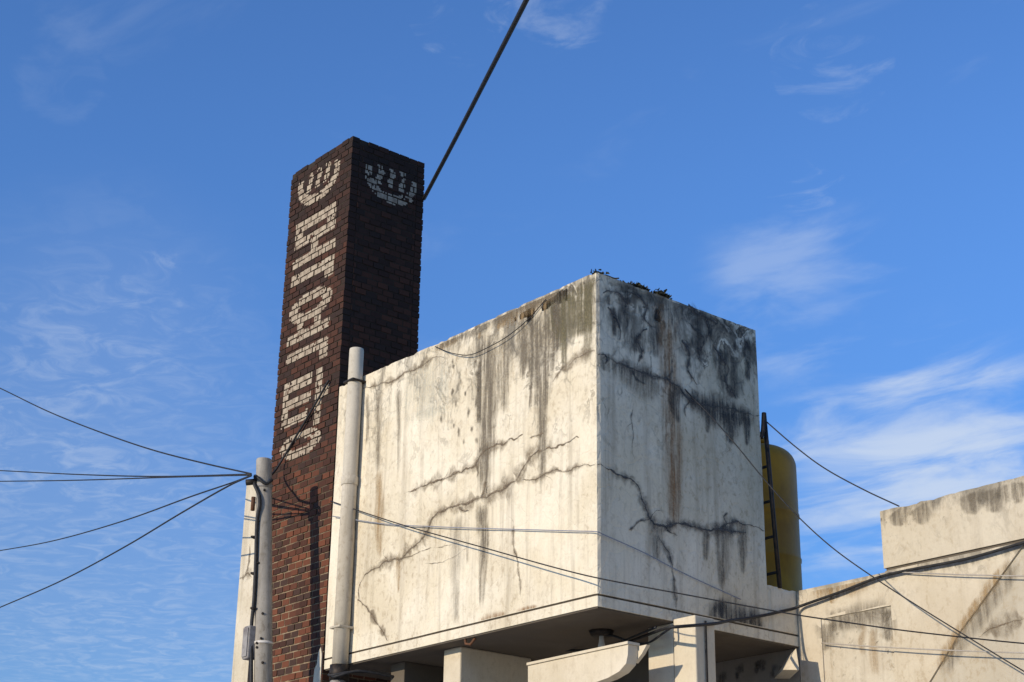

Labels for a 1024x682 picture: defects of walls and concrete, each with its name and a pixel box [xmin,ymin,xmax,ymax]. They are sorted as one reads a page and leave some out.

damp [478,508,488,594]
damp [442,280,592,484]
crack [358,290,763,640]
damp [670,341,750,444]